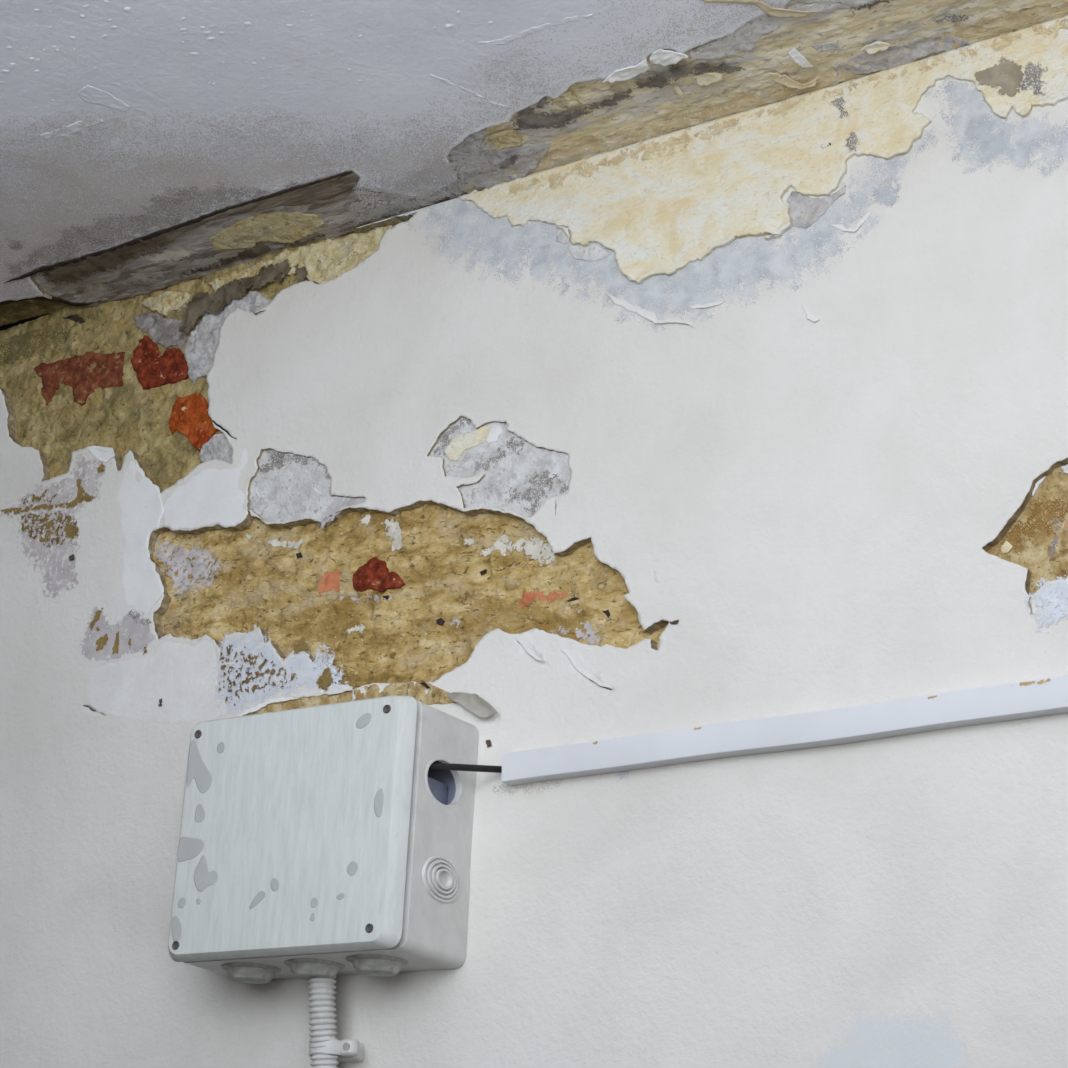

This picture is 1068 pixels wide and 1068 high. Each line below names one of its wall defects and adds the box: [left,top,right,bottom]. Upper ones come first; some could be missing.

water stain [0,0,783,300]
peeling [702,0,823,18]
peeling [0,16,1068,724]